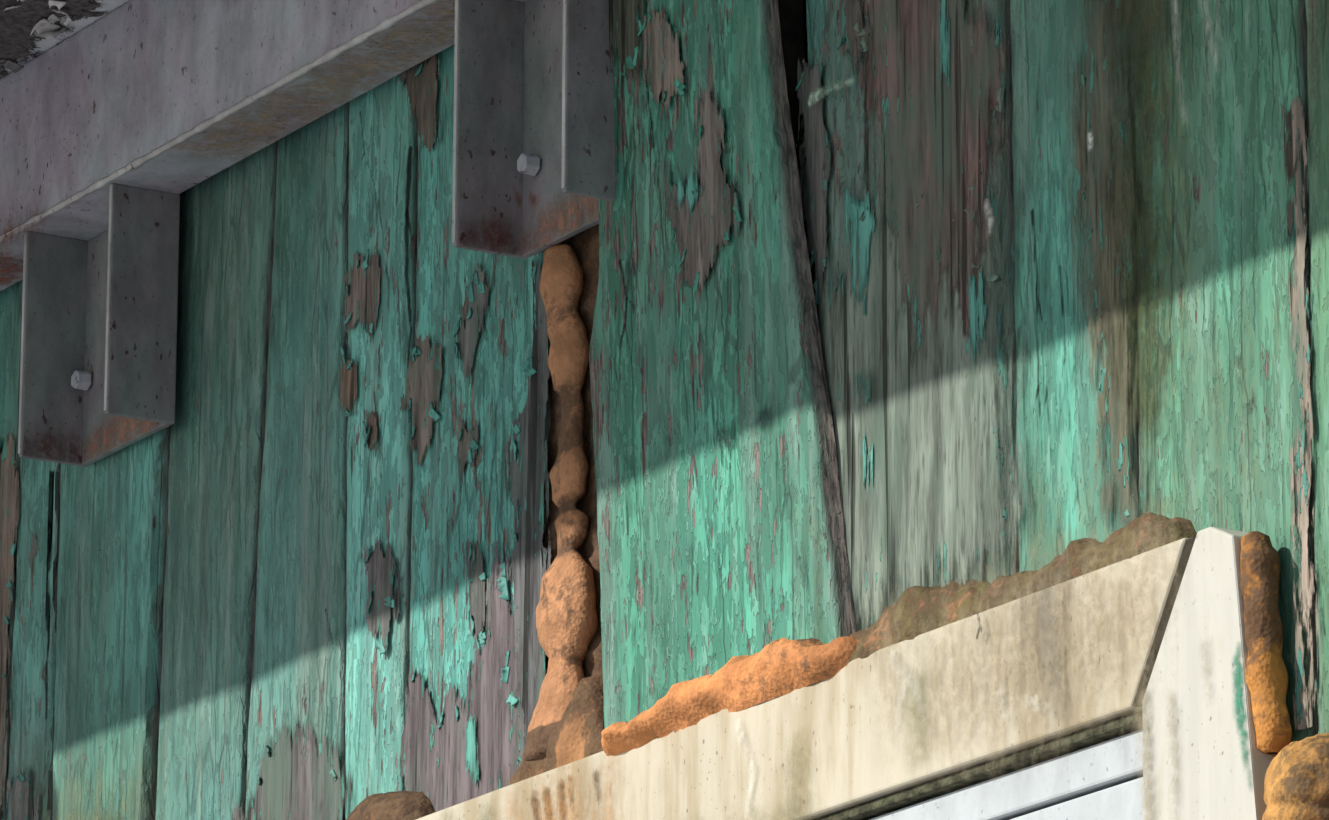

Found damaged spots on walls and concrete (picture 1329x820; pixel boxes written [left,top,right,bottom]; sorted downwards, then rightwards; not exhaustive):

peeling [0,0,107,78]
peeling [608,0,742,292]
peeling [339,248,384,457]
peeling [395,259,551,812]
peeling [364,536,401,655]
peeling [230,714,351,820]
water stain [531,776,572,820]